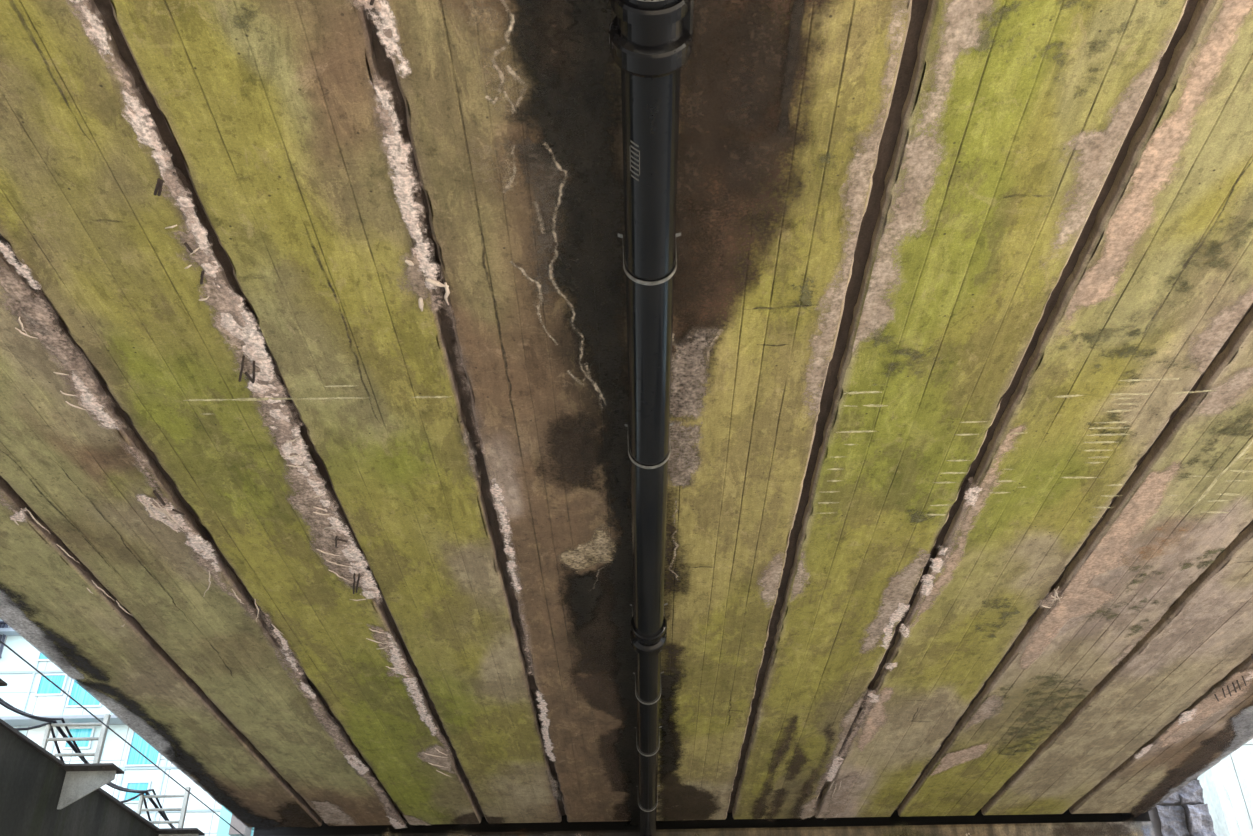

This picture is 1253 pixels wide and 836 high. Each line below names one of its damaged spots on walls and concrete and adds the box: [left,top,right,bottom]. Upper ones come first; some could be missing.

spalling [354,0,411,75]
spalling [0,242,125,429]
spalling [68,0,381,603]
spalling [374,77,453,318]
crack [478,221,516,421]
leakage [470,0,639,826]
leakage [664,0,833,619]
leakage [0,583,333,831]
spalling [124,445,430,829]
leakage [656,643,721,836]
leakage [752,717,836,822]
peeling [860,426,1024,654]